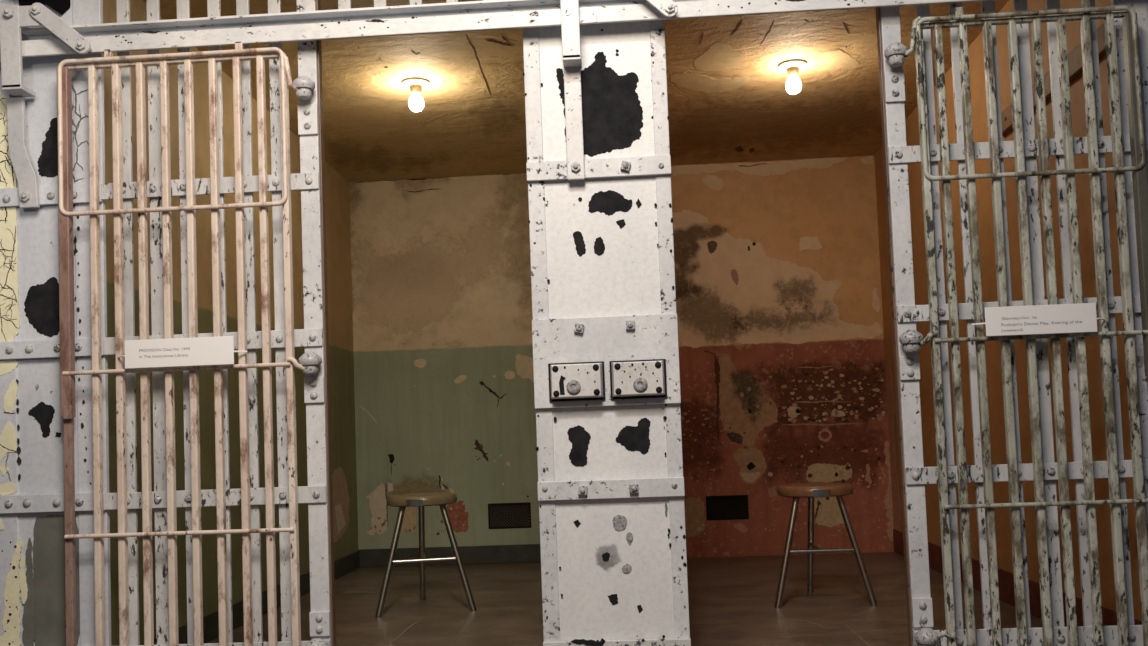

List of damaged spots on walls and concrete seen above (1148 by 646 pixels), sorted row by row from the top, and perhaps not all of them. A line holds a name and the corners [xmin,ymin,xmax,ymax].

crack [466,36,513,98]
peeling [556,68,566,136]
peeling [581,49,653,157]
peeling [24,277,60,337]
spalling [73,204,81,335]
water stain [673,225,743,342]
crack [0,92,28,646]
peeling [578,190,894,574]
peeling [366,454,395,535]
peeling [436,501,469,535]